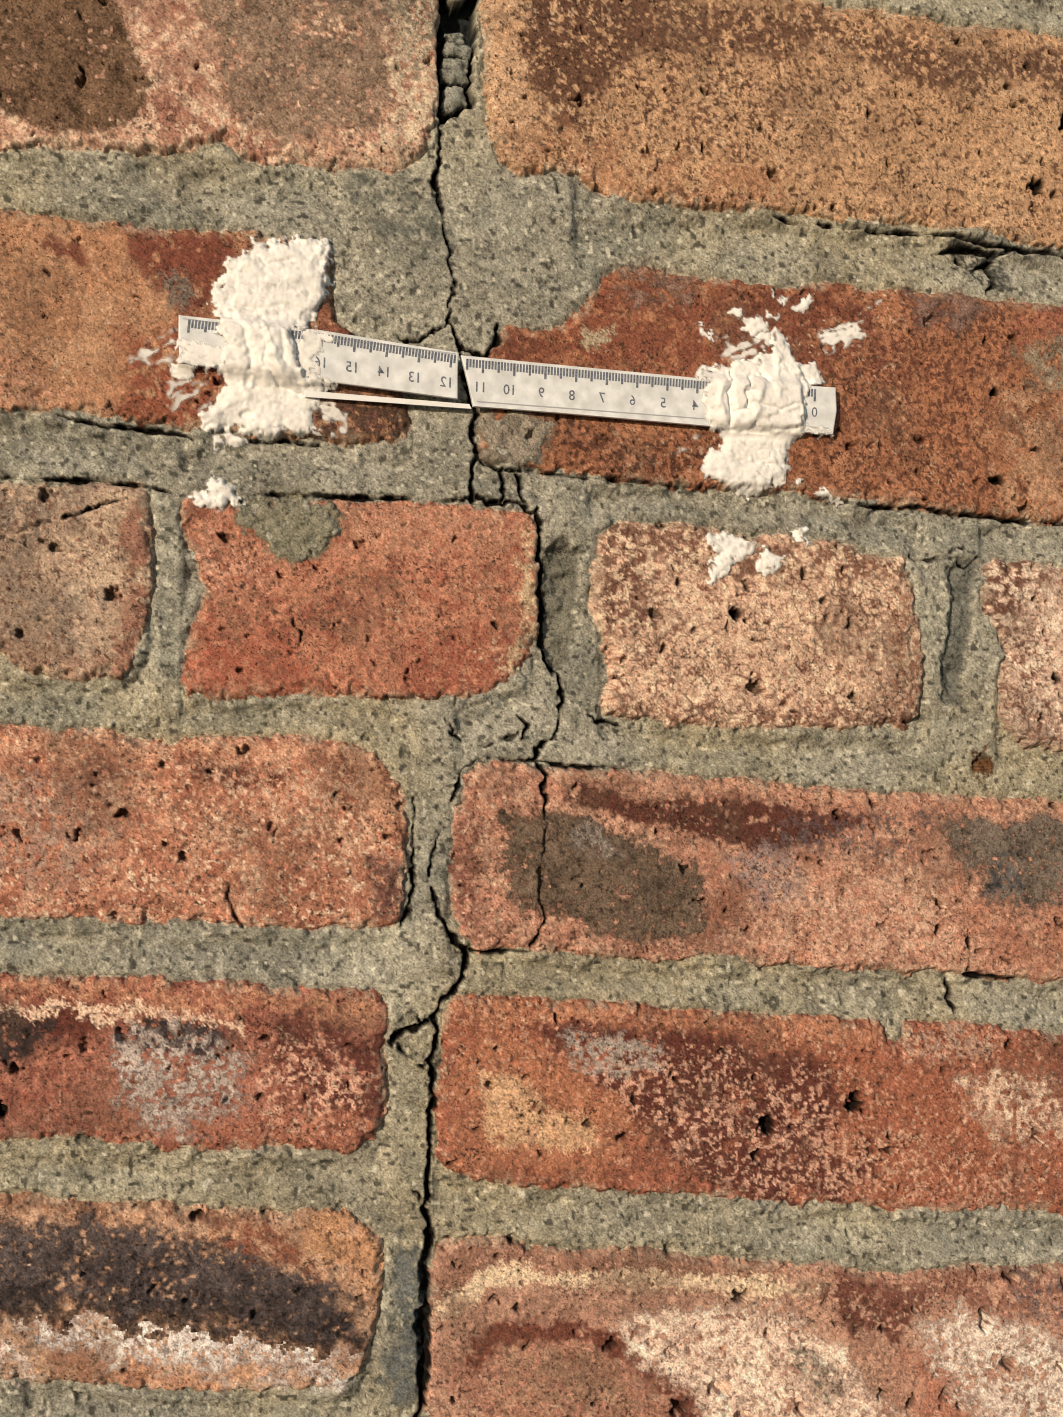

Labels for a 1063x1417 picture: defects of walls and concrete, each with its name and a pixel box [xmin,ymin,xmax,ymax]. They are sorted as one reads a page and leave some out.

crack [265,0,691,813]
crack [774,216,1063,293]
crack [843,501,1063,570]
crack [387,807,546,1417]